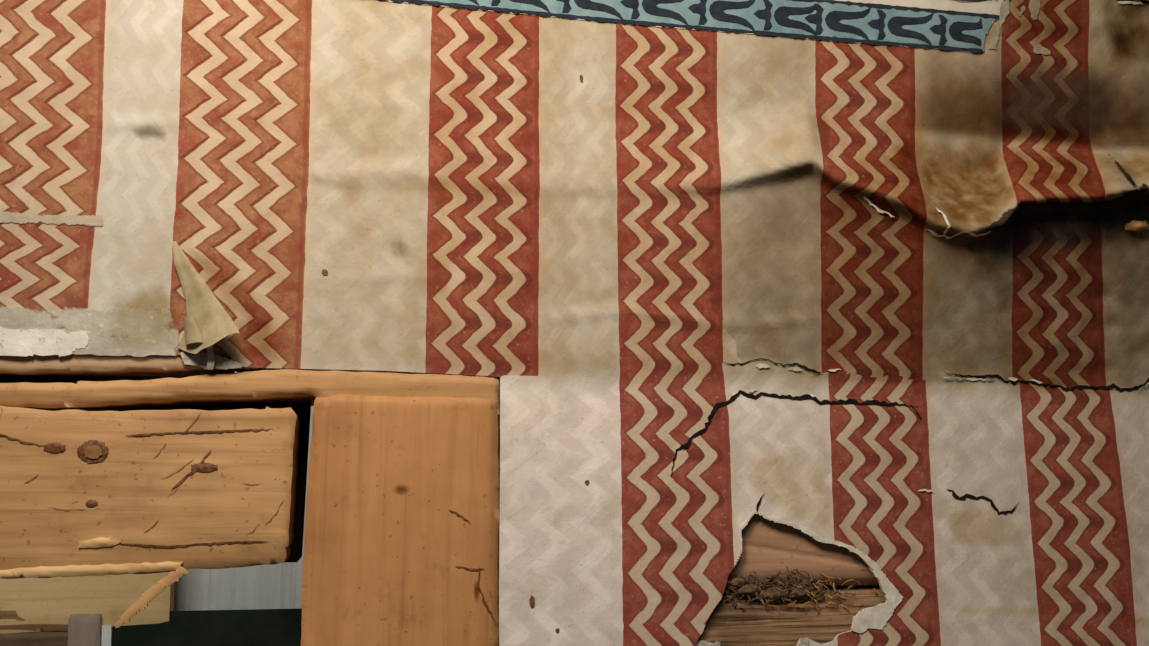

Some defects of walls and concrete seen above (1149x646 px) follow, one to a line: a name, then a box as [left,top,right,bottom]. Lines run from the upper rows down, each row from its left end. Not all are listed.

crack [1118,0,1149,8]
damp [931,74,1149,145]
damp [956,193,1149,256]
peeling [0,306,179,357]
crack [943,373,1149,392]
crack [671,358,921,476]
crack [917,489,1019,515]